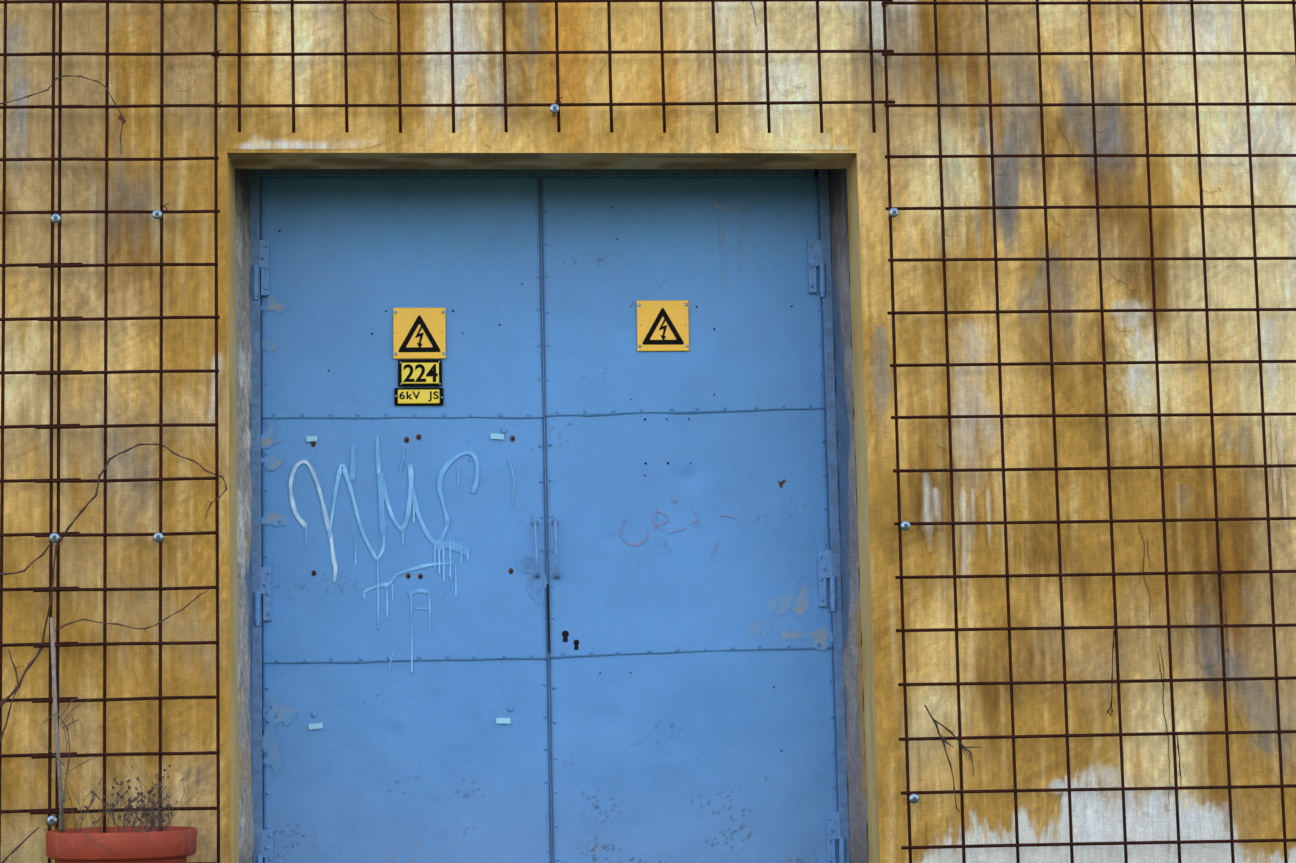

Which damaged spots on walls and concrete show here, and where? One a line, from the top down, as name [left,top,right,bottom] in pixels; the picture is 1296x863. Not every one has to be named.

corrosion [118,3,212,152]
corrosion [367,0,442,130]
corrosion [547,2,607,103]
corrosion [1078,0,1120,132]
water stain [1122,0,1183,69]
corrosion [970,57,1014,325]
water stain [1046,60,1097,237]
water stain [1197,133,1236,193]
water stain [1080,317,1122,378]
corrosion [1220,526,1247,690]
peeling [913,797,1015,863]
flaking render [1035,758,1272,863]